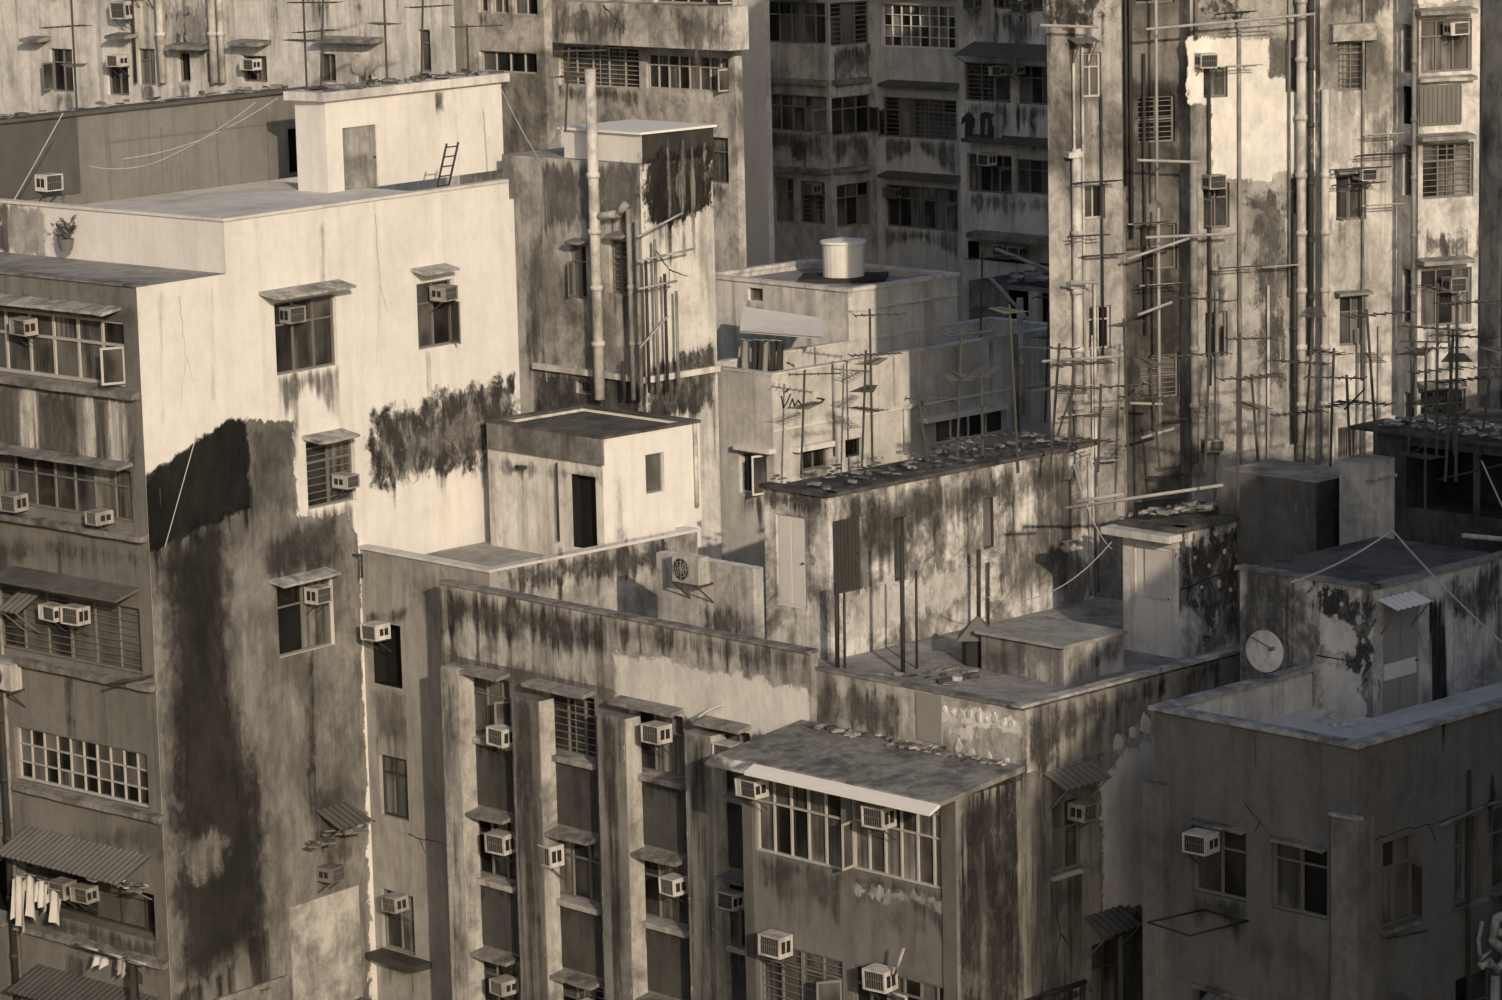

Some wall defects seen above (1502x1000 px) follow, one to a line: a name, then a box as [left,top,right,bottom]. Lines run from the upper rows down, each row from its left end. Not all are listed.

peeling [1185,35,1392,185]
water stain [772,133,866,167]
water stain [886,139,955,171]
water stain [368,143,724,492]
water stain [283,372,333,409]
water stain [439,539,673,666]
water stain [0,387,290,1000]
water stain [507,664,605,699]
water stain [705,606,785,669]
peeling [1022,656,1052,683]
peeling [1307,581,1381,716]
peeling [942,705,1023,765]